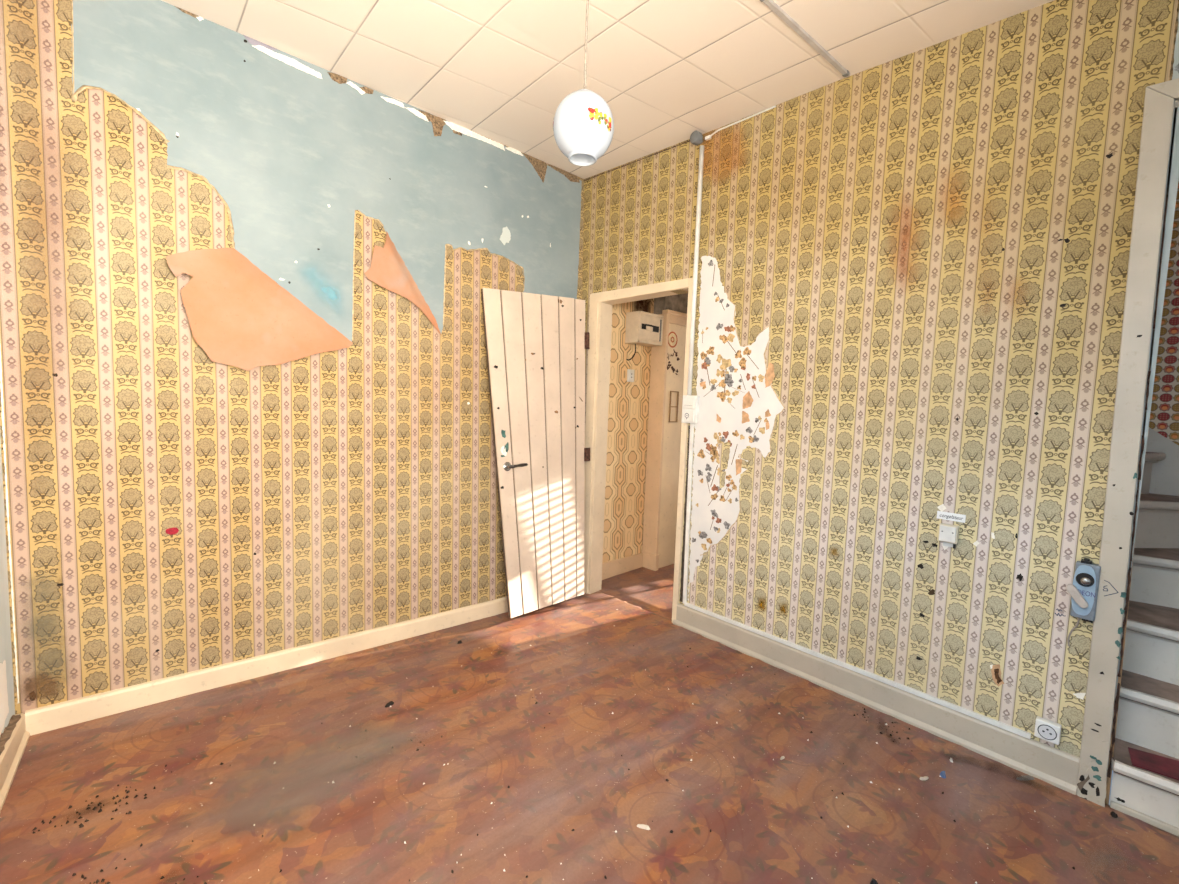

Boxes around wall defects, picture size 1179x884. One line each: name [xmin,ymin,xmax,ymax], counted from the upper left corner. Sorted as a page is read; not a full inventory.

peeling [71,0,582,371]
peeling [688,256,785,601]